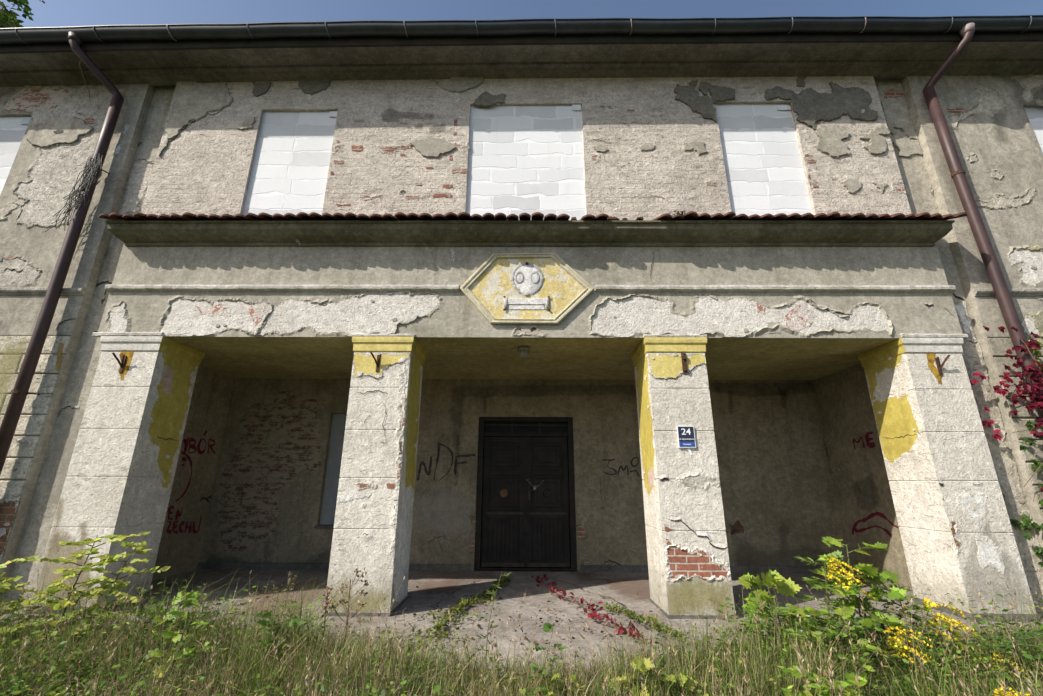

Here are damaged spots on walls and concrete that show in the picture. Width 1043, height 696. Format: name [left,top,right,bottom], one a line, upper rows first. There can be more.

flaking render [0,84,131,229]
flaking render [118,157,155,215]
flaking render [1007,245,1043,301]
flaking render [156,291,445,337]
flaking render [588,292,893,338]
peeling [145,352,198,501]
peeling [864,354,921,466]
flaking render [0,497,21,563]
crack [668,515,727,549]
flaking render [664,524,731,586]